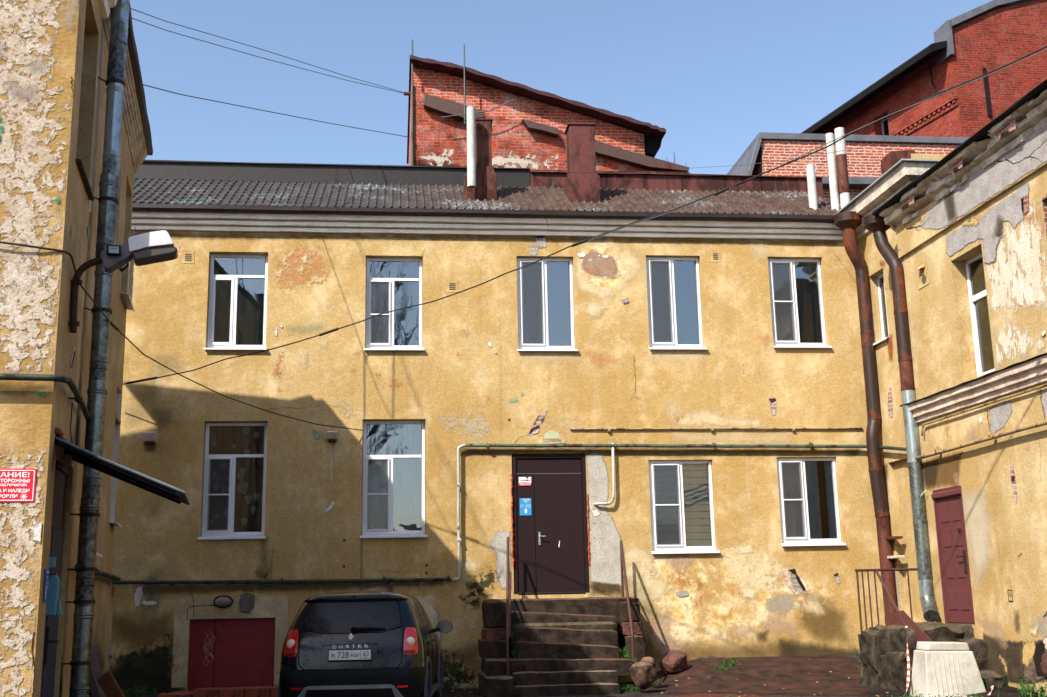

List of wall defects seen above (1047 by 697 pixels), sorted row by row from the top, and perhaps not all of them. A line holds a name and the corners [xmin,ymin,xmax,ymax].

peeling [0,0,70,373]
flaking render [996,118,1016,139]
crack [997,139,1047,164]
peeling [575,237,641,316]
peeling [919,125,1047,368]
peeling [978,401,1012,433]
peeling [0,449,46,697]
peeling [491,531,511,589]
peeling [586,453,841,649]